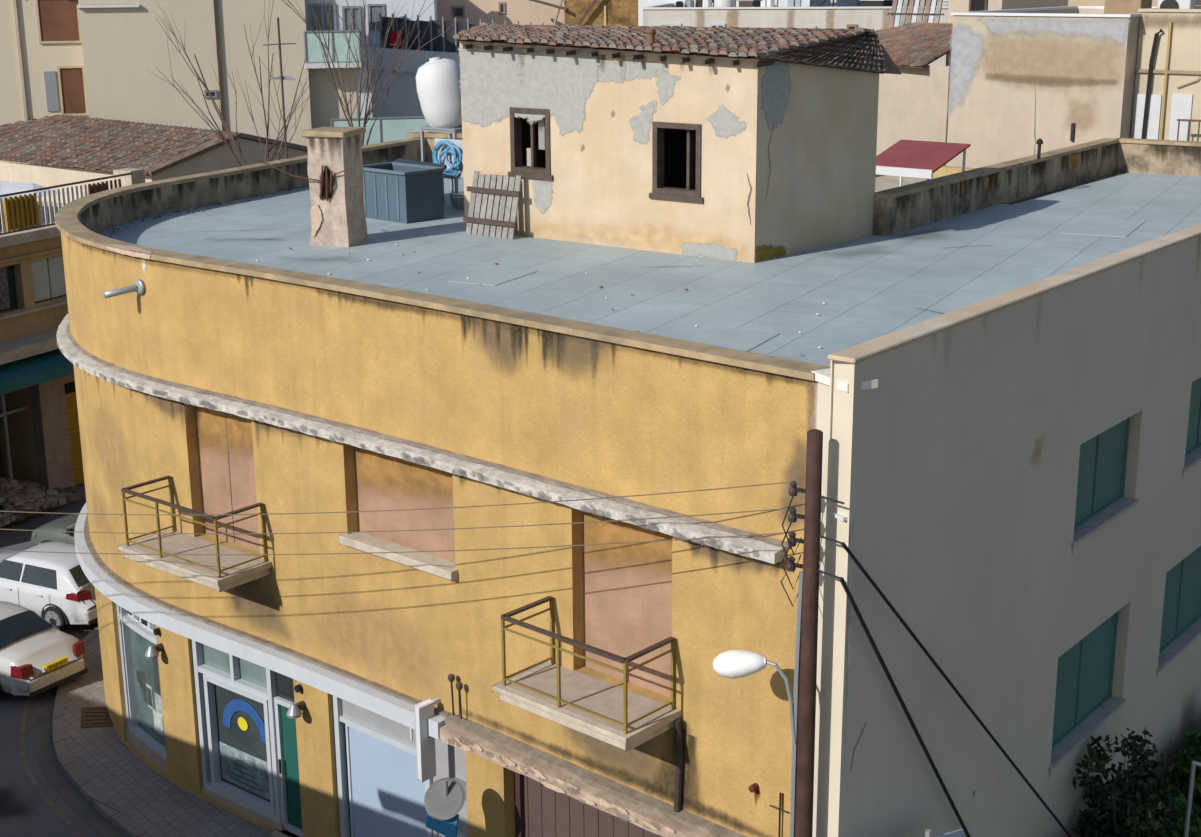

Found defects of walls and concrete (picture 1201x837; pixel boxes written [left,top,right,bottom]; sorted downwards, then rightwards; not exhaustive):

peeling [458,45,680,144]
peeling [761,61,791,131]
peeling [707,105,746,138]
peeling [532,179,553,214]
crack [747,125,774,225]
water stain [1063,143,1118,167]
peeling [682,243,737,261]
water stain [461,314,597,364]